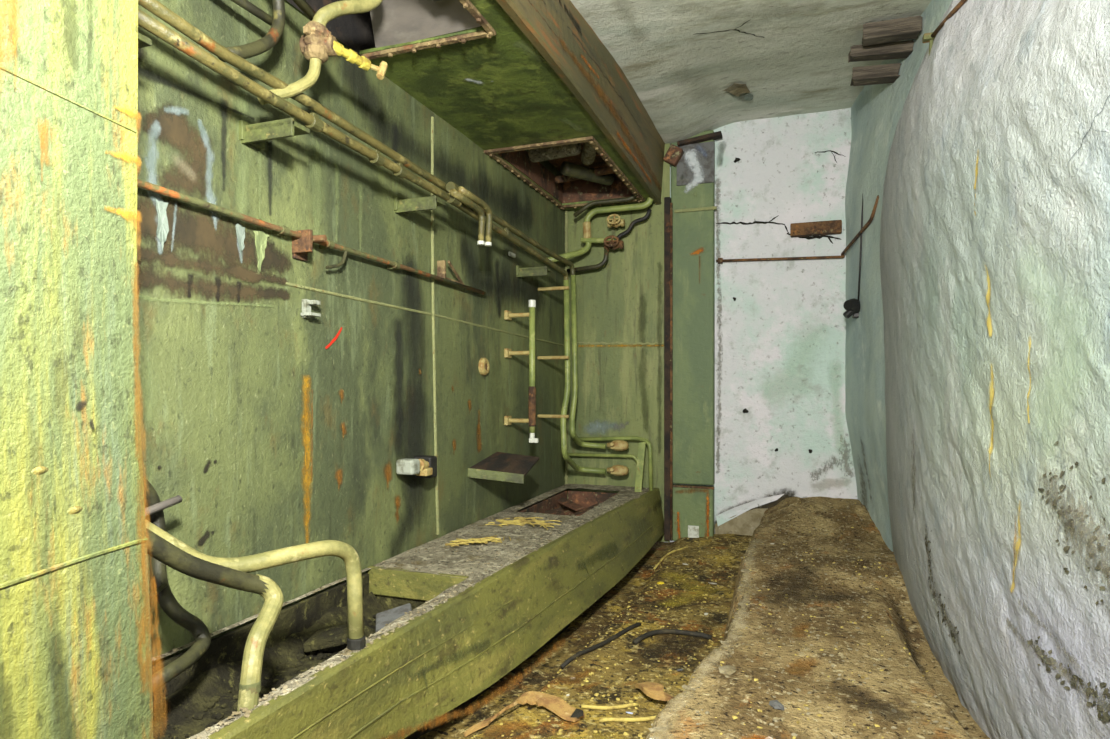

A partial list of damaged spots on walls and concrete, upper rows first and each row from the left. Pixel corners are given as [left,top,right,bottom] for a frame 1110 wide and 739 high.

leakage [138,67,254,190]
leakage [137,141,291,307]
rust [302,377,313,543]
mould [1038,461,1110,605]